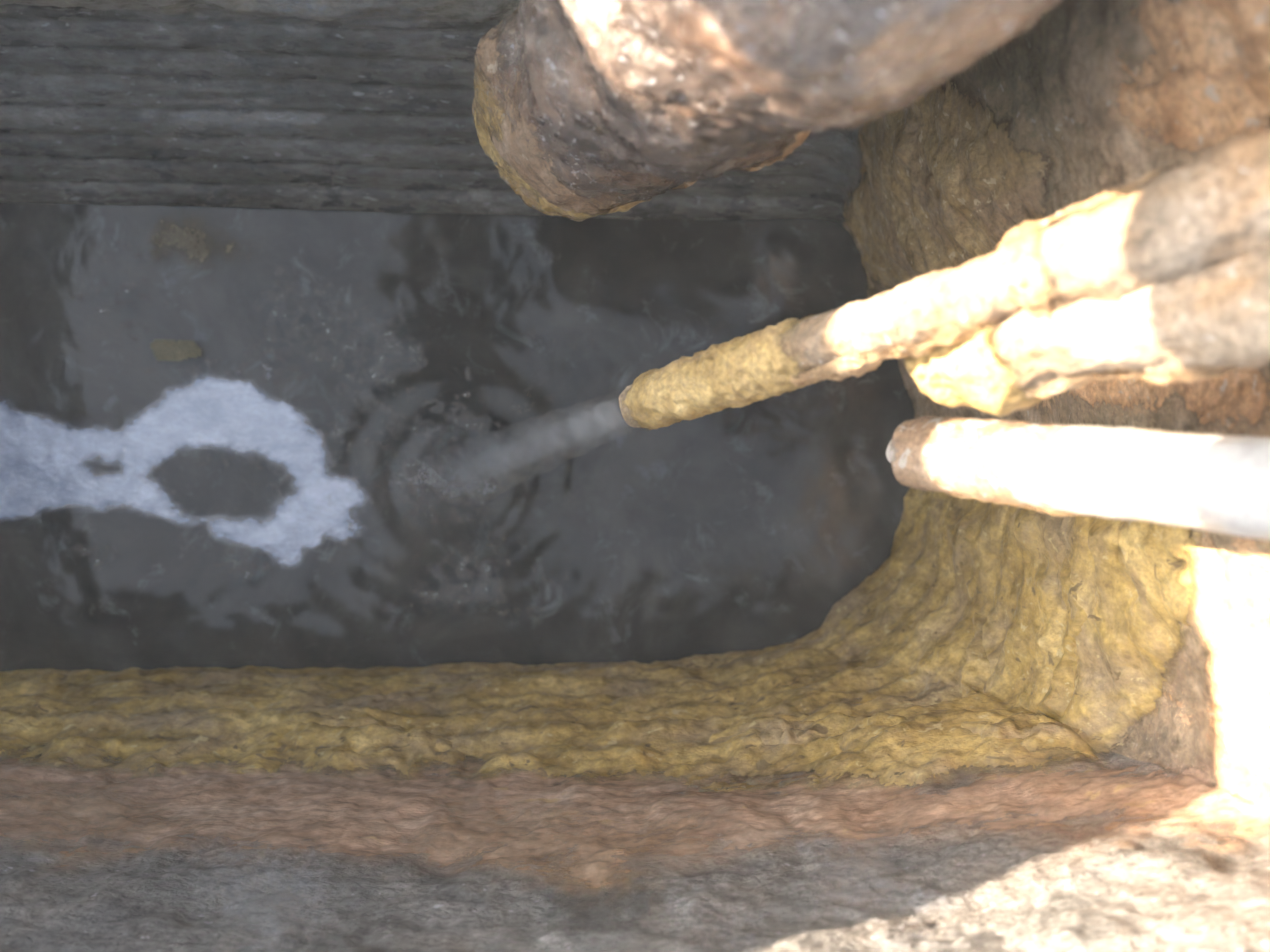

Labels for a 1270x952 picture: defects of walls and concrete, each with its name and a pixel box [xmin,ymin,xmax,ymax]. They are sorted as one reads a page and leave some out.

water stain [0,488,1197,792]